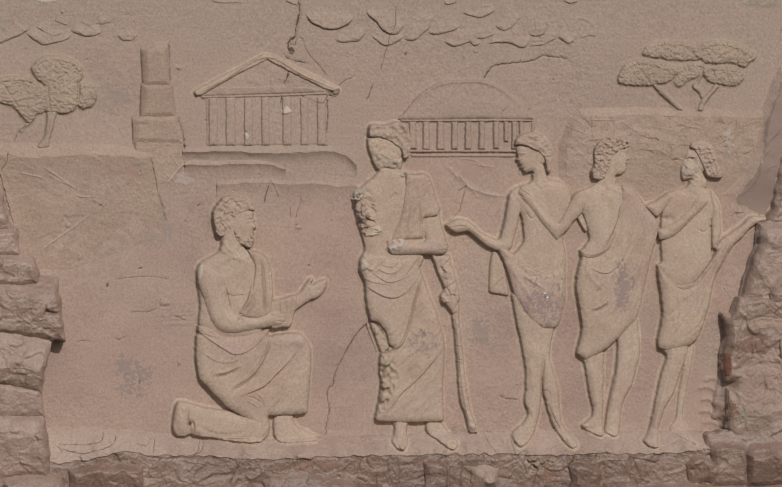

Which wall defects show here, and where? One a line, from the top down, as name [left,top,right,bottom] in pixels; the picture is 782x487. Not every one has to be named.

crack [280,1,351,133]
crack [326,324,366,433]